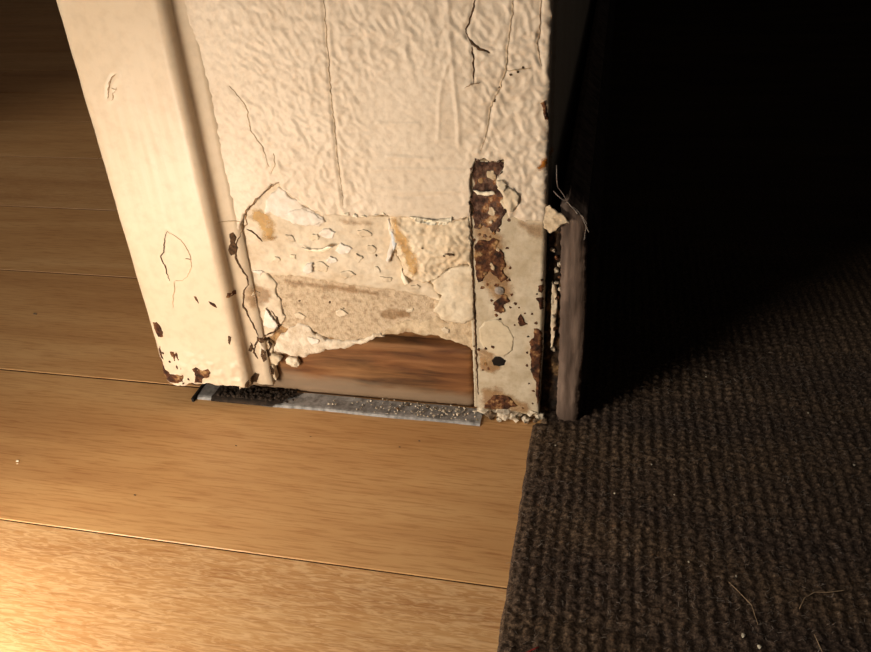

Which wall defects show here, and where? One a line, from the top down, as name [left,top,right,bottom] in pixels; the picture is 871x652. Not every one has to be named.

crack [465,0,542,151]
crack [160,231,192,304]
peeling [159,348,210,385]
crack [217,86,281,359]
spalling [228,183,514,387]
rust [470,158,547,411]
spalling [540,205,570,413]